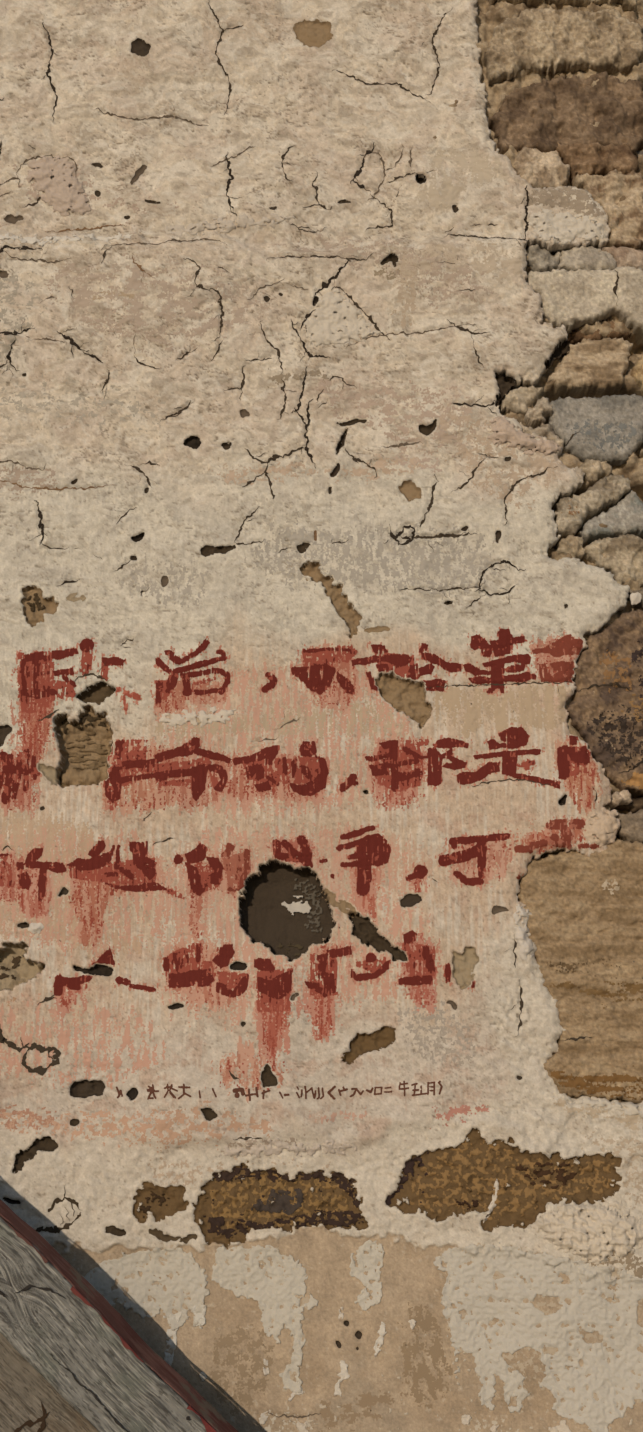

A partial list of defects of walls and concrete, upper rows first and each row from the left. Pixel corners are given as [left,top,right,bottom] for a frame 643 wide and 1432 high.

crack [42,23,61,120]
crack [96,3,243,126]
crack [332,9,452,101]
crack [0,143,580,551]
hole [495,373,517,407]
spalling [544,340,570,369]
crack [0,460,160,595]
crack [401,560,526,607]
spalling [0,530,595,908]
spalling [0,825,479,1012]
flaking render [105,1160,368,1249]
flaking render [385,1128,622,1232]